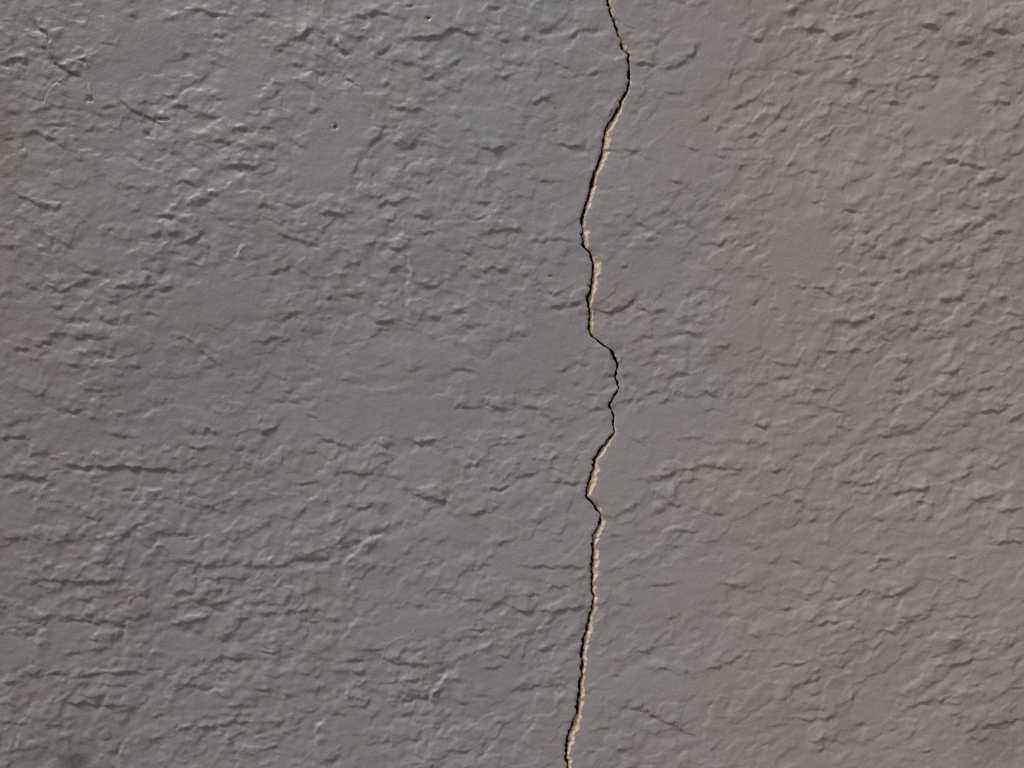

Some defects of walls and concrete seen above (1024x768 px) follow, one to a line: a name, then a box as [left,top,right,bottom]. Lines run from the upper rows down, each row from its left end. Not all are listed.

crack [564,0,648,768]